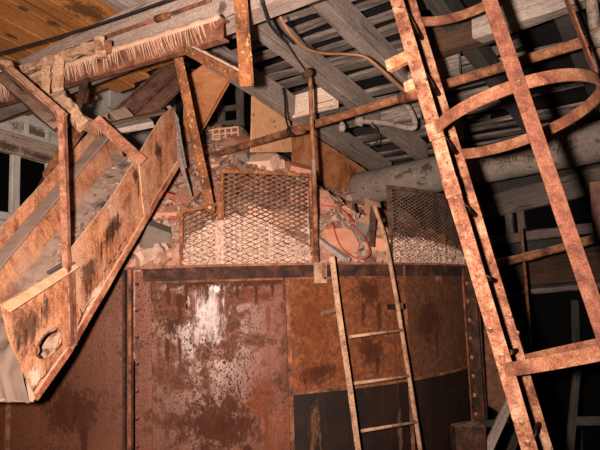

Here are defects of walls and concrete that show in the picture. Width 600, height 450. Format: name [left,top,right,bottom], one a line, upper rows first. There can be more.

rust [100,214,121,260]
rust [83,260,95,297]
rust [15,299,48,351]
rust [163,280,285,364]
rust [357,279,381,330]
rust [299,364,336,384]
rust [360,337,383,375]
rust [178,389,263,450]